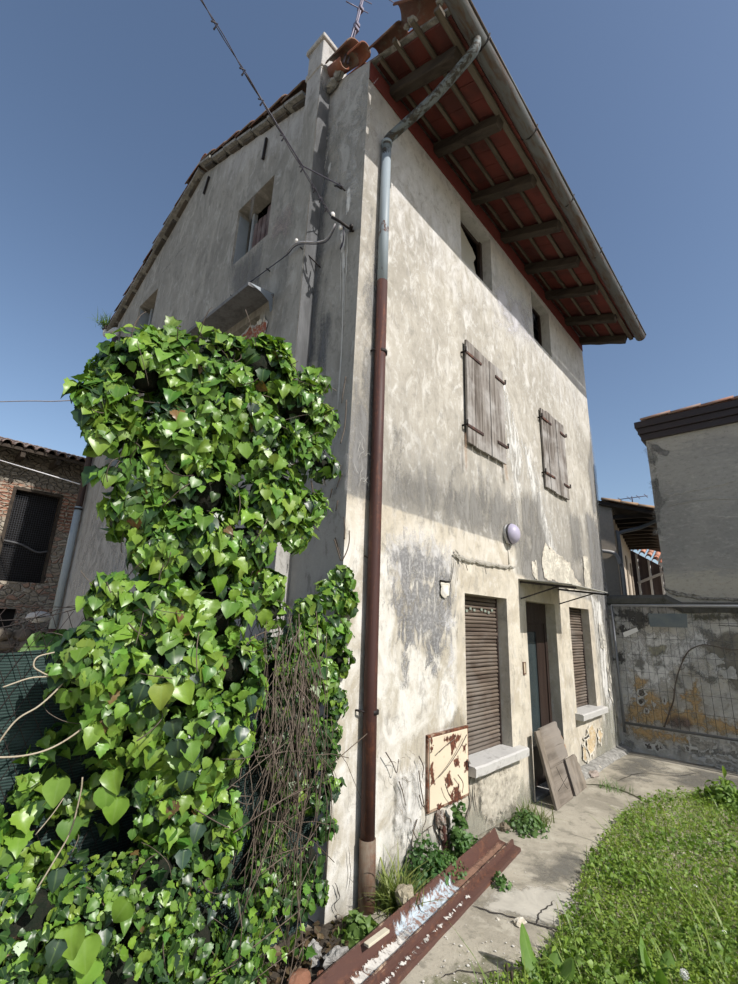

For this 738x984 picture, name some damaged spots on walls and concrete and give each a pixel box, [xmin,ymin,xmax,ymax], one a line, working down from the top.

leakage [384,535,456,687]
peeling [705,653,738,681]
peeling [582,723,603,764]
peeling [683,734,738,772]